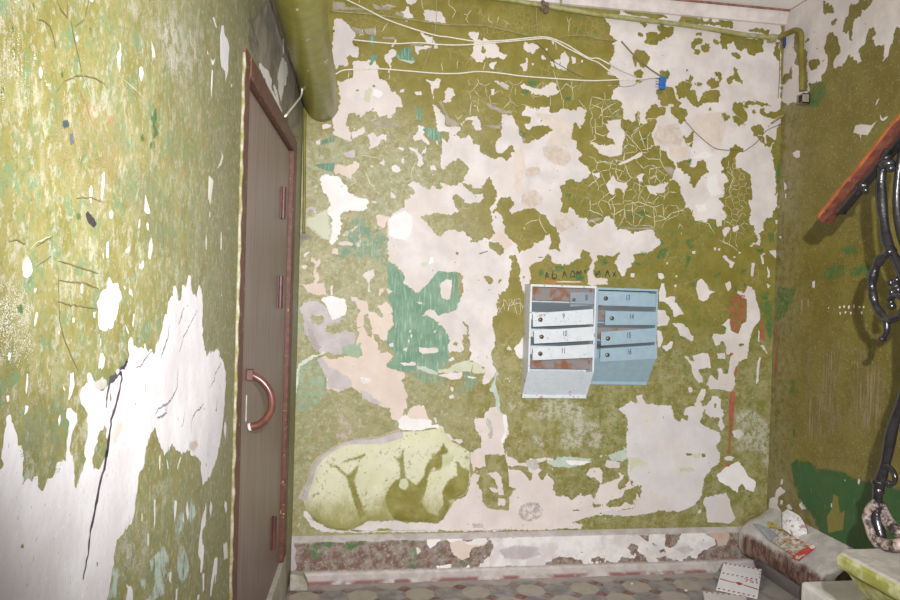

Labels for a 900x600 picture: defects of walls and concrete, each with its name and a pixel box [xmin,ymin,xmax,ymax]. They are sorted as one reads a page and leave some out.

crack [456,62,748,251]
flaking render [0,257,228,600]
crack [83,309,197,579]
crack [155,363,221,427]
peeling [296,0,900,569]
corrosion [725,392,736,467]
corrosion [729,295,746,334]